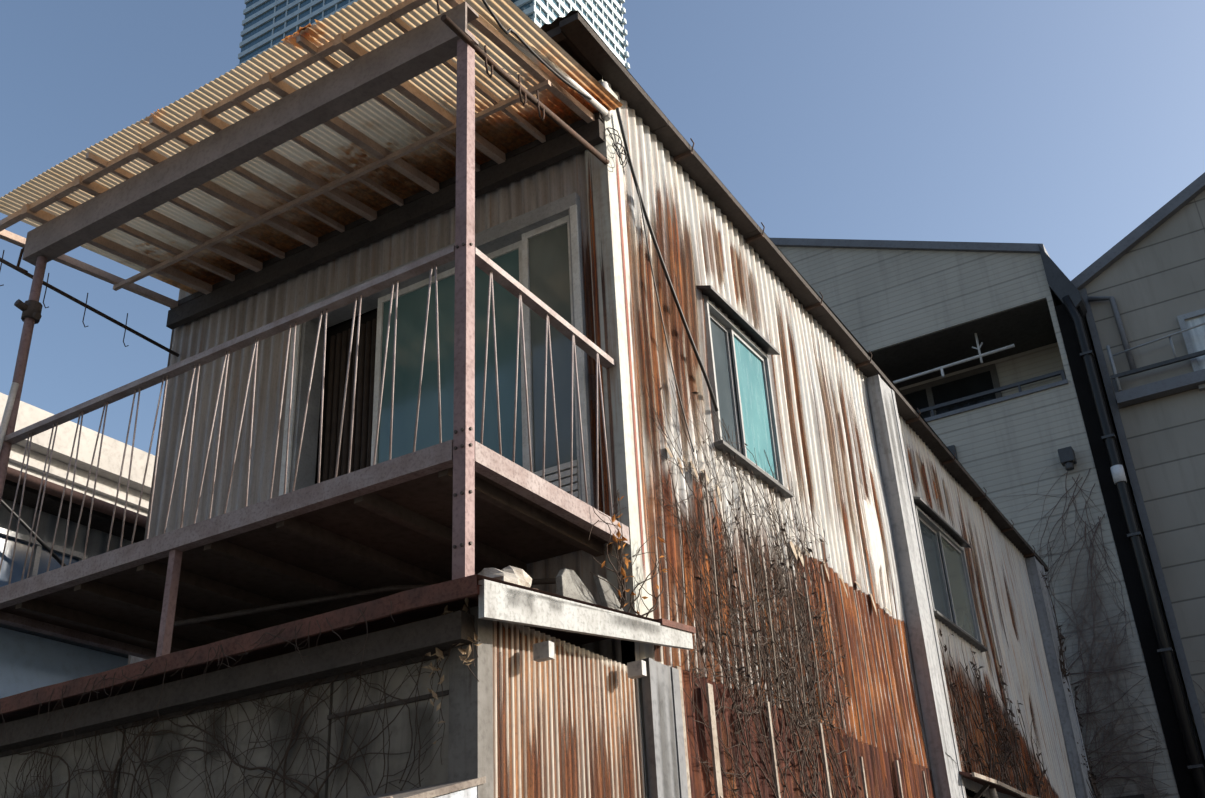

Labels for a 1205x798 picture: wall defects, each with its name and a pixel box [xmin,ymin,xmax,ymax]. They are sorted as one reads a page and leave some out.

rust [493,621,643,798]
rust [616,159,935,798]
rust [907,447,1059,798]